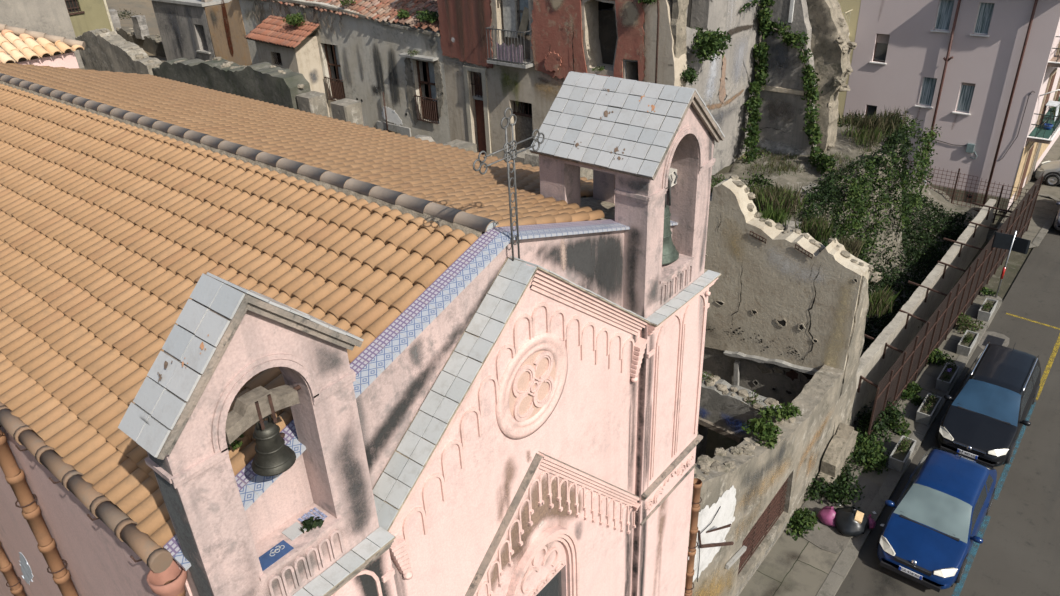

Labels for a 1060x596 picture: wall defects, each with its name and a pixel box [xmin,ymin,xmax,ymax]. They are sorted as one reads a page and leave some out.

crack [802,265,821,364]
leakage [538,229,652,596]
leakage [491,479,581,586]
peeling [688,486,736,581]